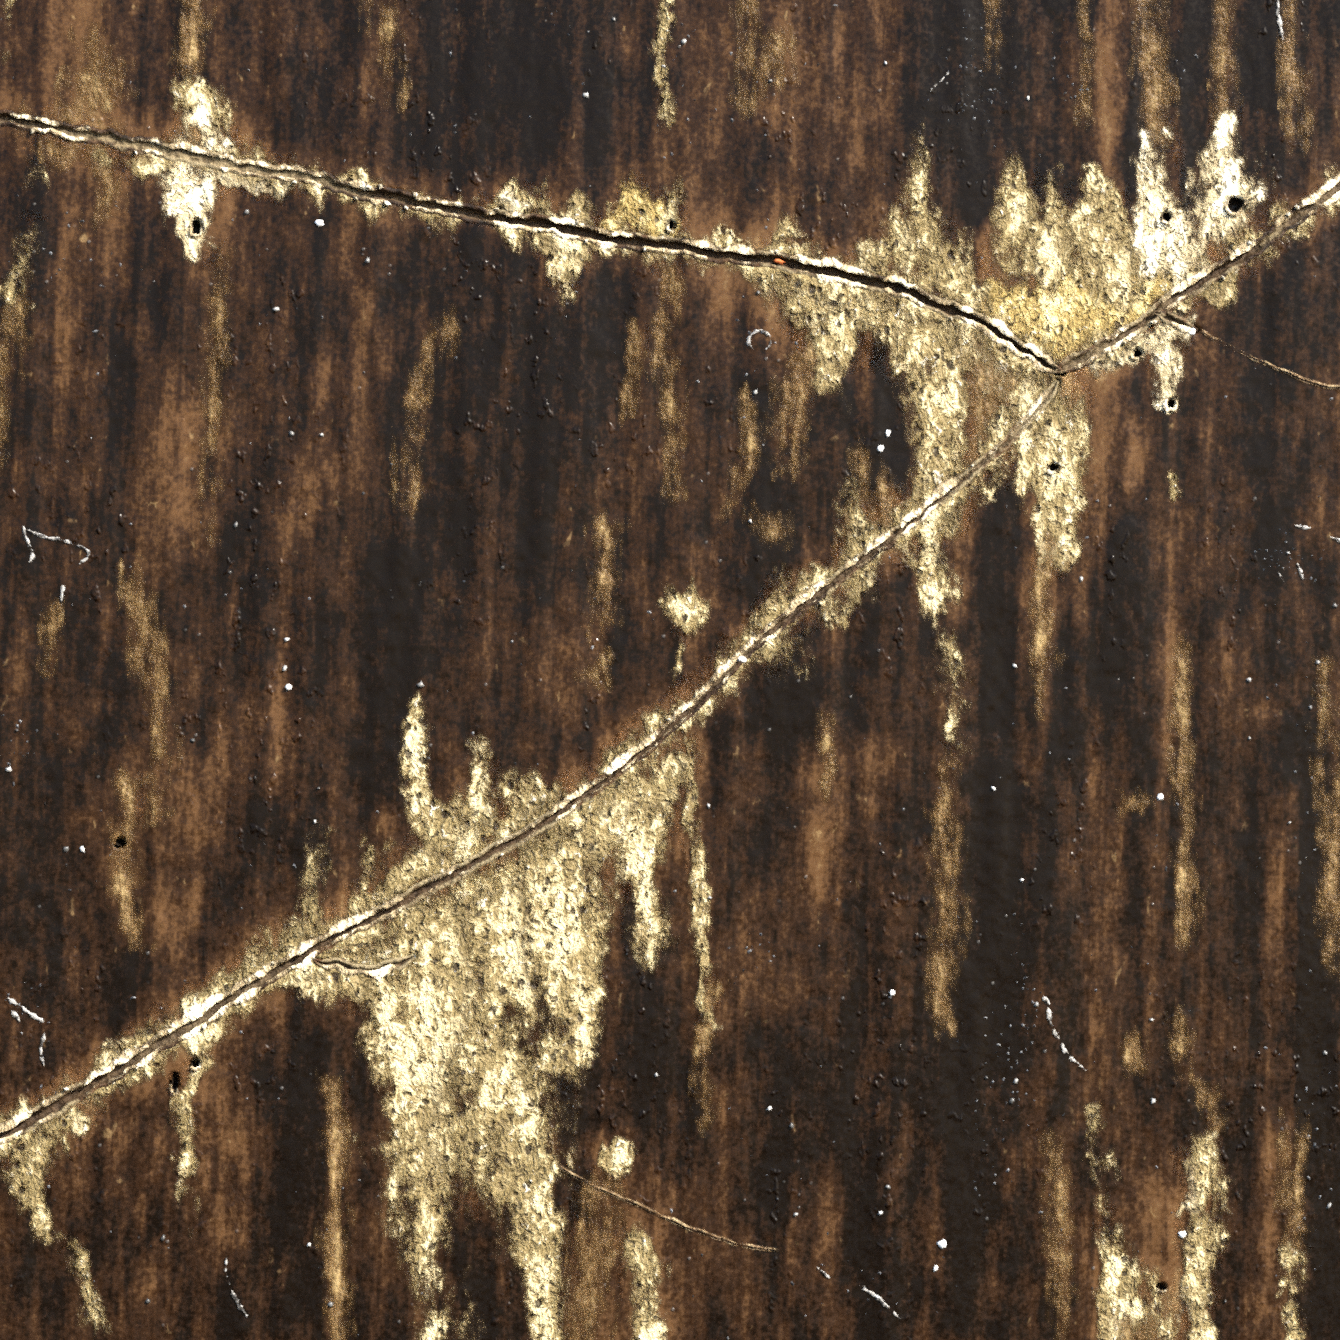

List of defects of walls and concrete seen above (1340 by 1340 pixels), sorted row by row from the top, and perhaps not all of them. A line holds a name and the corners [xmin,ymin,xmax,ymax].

leakage [1080,0,1091,115]
leakage [855,451,889,522]
crack [0,109,1340,1157]
leakage [674,644,685,673]
leakage [679,737,723,1123]
leakage [324,1083,350,1340]
crack [560,1166,777,1252]